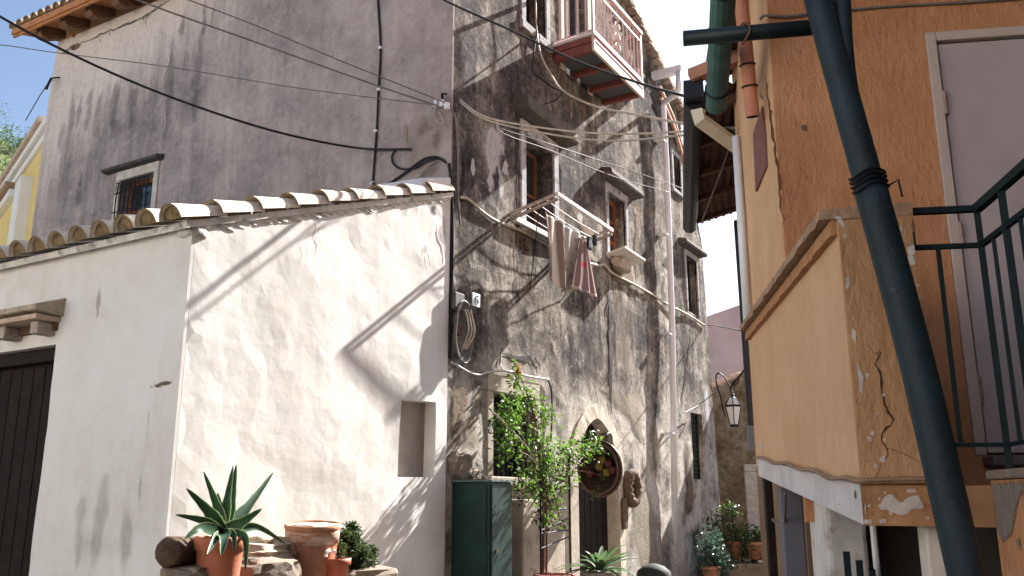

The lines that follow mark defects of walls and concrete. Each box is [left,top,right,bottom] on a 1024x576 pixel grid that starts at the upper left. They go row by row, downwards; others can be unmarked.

peeling [907,244,916,265]
peeling [856,363,877,394]
crack [869,346,913,477]
peeling [864,489,930,524]
spalling [991,481,1024,549]